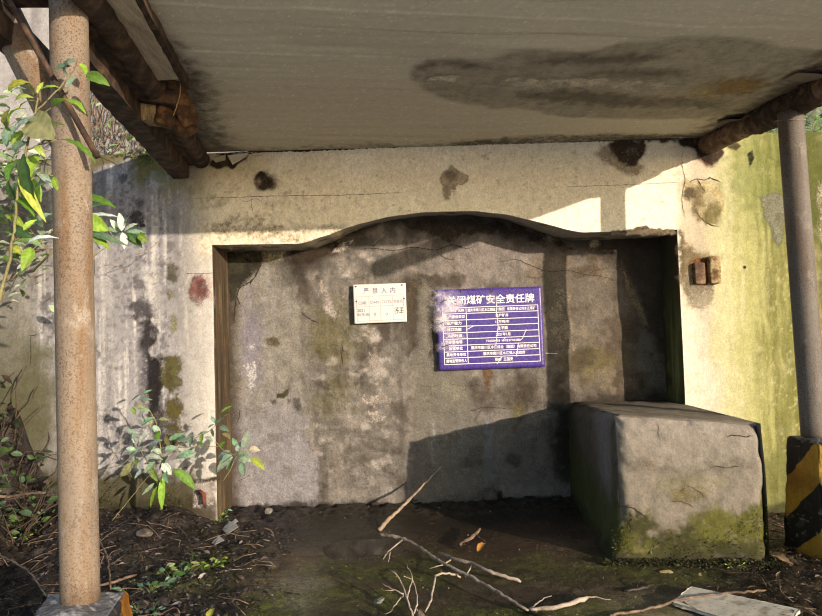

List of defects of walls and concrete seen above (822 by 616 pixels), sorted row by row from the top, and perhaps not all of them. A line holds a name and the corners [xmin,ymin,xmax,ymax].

leakage [502,54,685,110]
crack [216,147,398,155]
spalling [599,140,646,174]
spalling [254,171,277,191]
crack [455,138,720,227]
crack [360,236,477,260]
corrosion [678,230,714,308]
corrosion [189,275,212,304]
leakage [129,278,185,455]